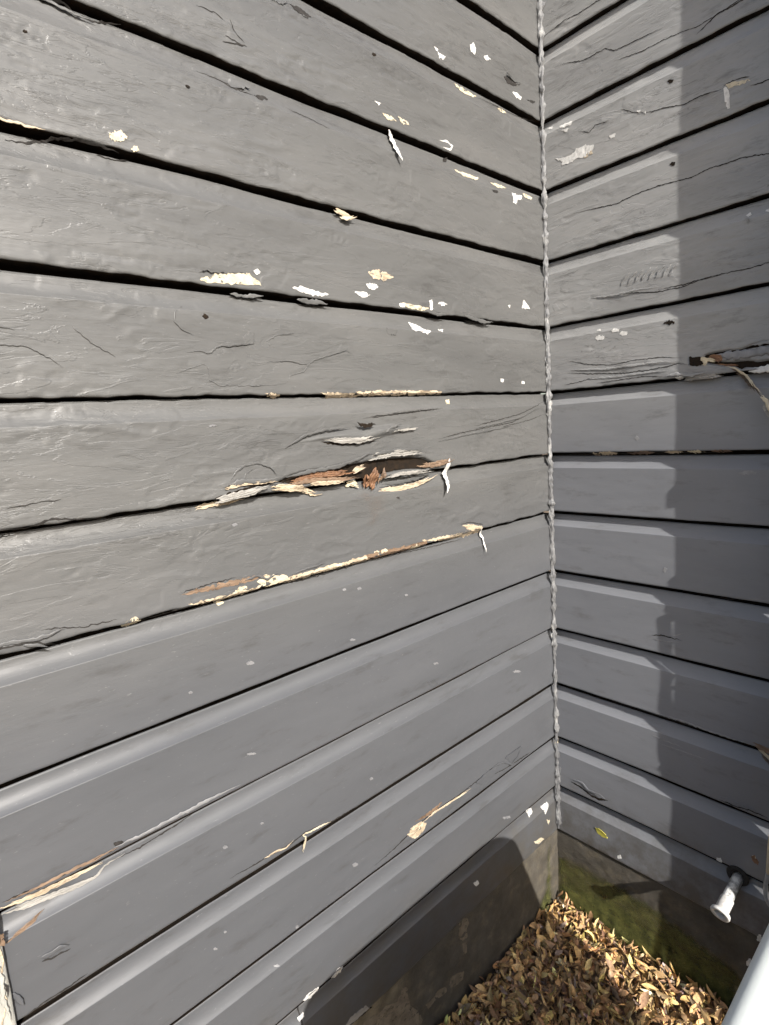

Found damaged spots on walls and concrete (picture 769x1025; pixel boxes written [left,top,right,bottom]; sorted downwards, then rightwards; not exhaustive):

crack [43,0,121,25]
crack [198,6,247,47]
crack [565,0,743,64]
crack [0,117,128,162]
peeling [375,101,409,161]
crack [581,89,721,133]
peeling [441,140,532,204]
crack [581,153,769,212]
peeling [200,265,262,300]
peeling [399,300,447,335]
spalling [318,457,430,479]
peeling [116,522,486,628]